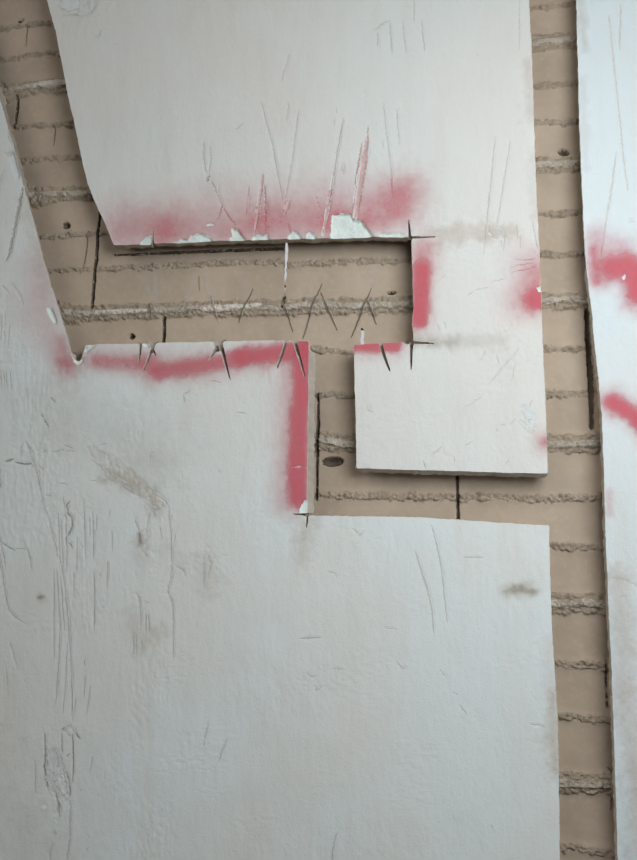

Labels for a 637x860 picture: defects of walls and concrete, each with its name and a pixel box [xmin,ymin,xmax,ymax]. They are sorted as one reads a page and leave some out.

spalling [173,223,214,243]